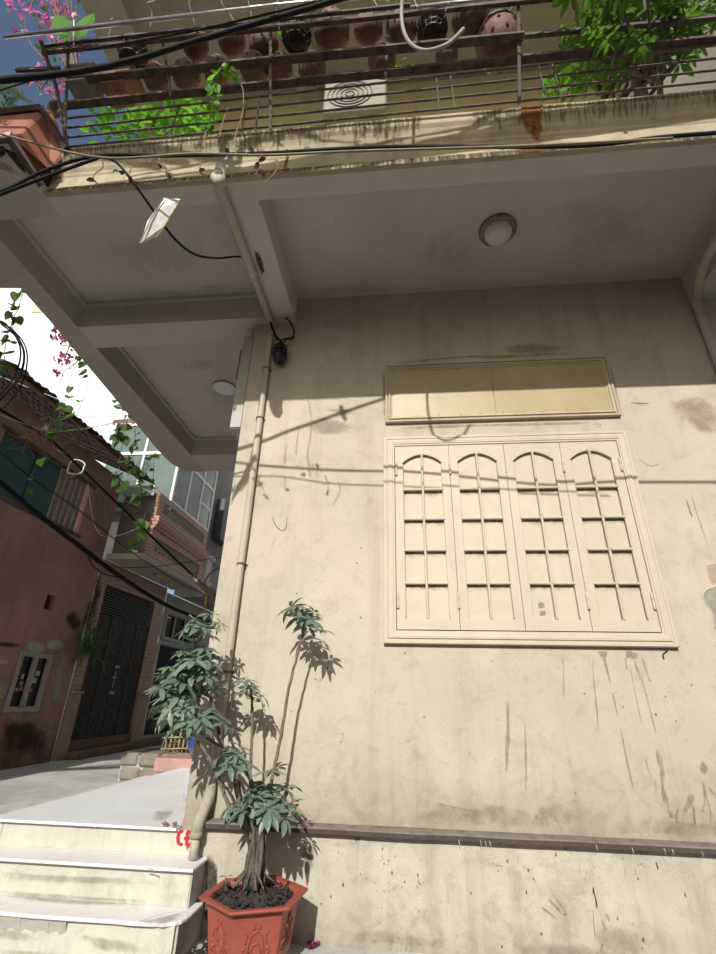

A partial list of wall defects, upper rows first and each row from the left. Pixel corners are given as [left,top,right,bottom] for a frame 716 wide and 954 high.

corrosion [519,104,547,152]
water stain [48,175,210,192]
water stain [228,149,562,177]
peeling [701,574,716,647]